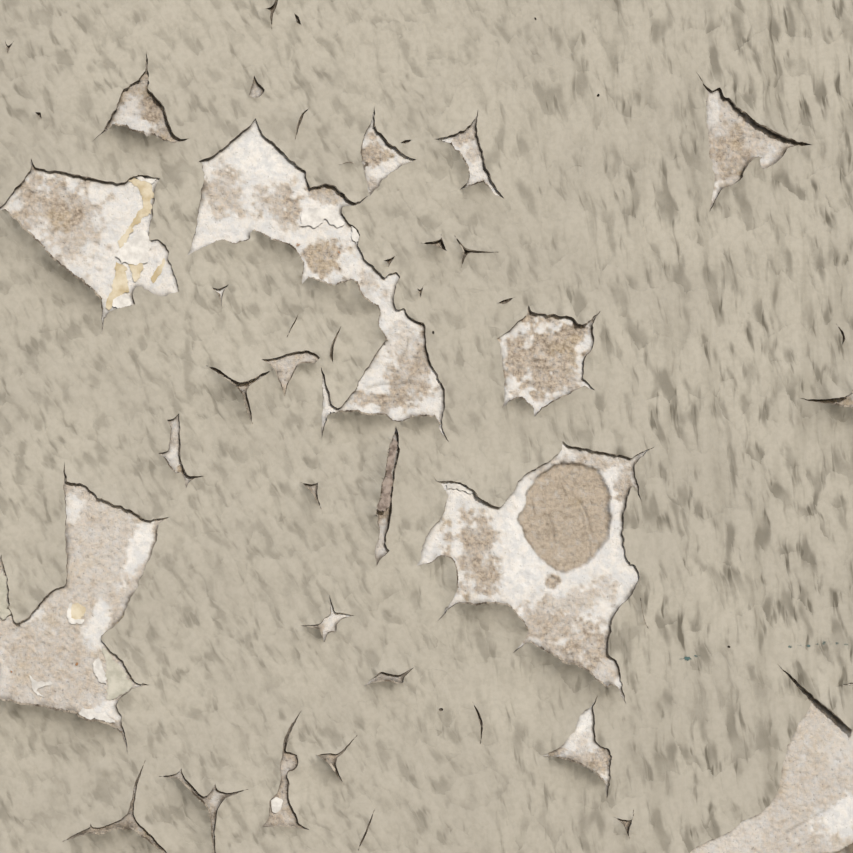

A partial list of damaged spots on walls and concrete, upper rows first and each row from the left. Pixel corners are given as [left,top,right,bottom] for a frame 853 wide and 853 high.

peeling [85,56,190,155]
peeling [425,112,503,205]
peeling [696,81,810,209]
peeling [0,159,179,347]
peeling [185,112,455,454]
peeling [149,414,203,488]
peeling [491,305,600,425]
peeling [783,362,853,446]
peeling [0,461,169,770]
peeling [408,434,652,810]
peeling [261,714,309,838]
peeling [651,633,853,853]